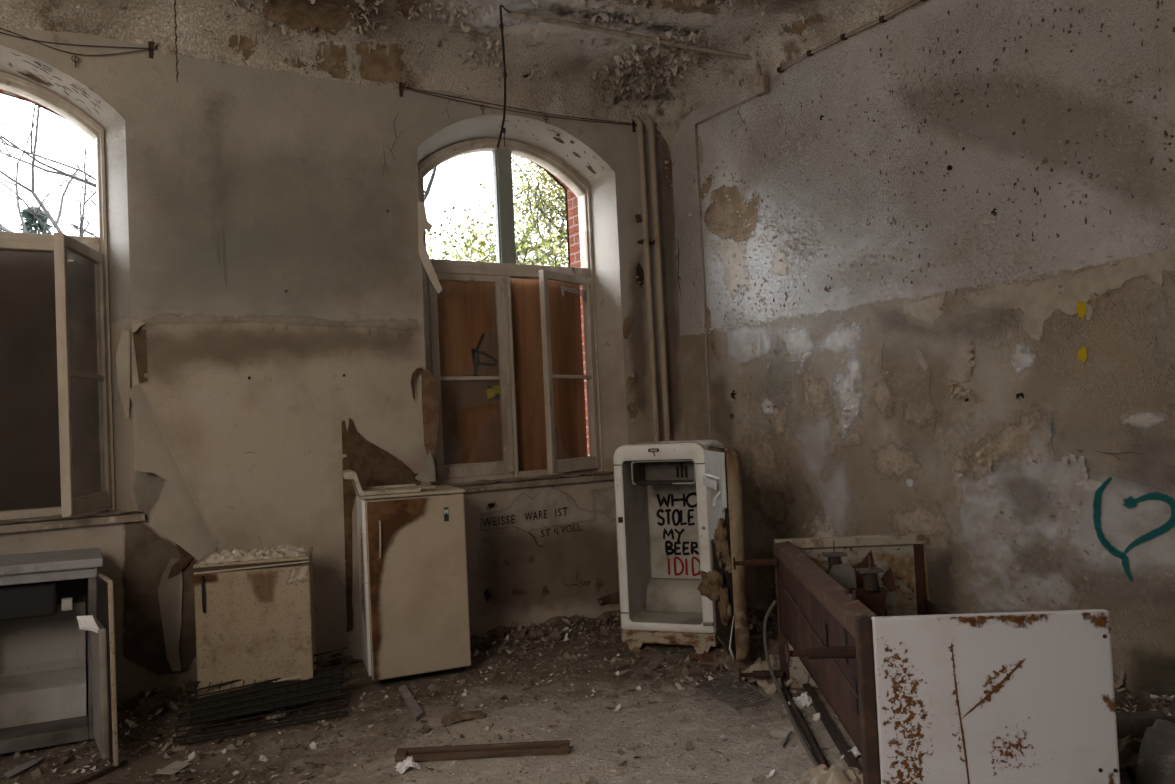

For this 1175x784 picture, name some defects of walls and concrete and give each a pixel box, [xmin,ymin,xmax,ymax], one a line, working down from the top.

peeling [869,7,1083,284]
peeling [990,131,1119,242]
peeling [962,246,1175,373]
water stain [962,434,1175,612]